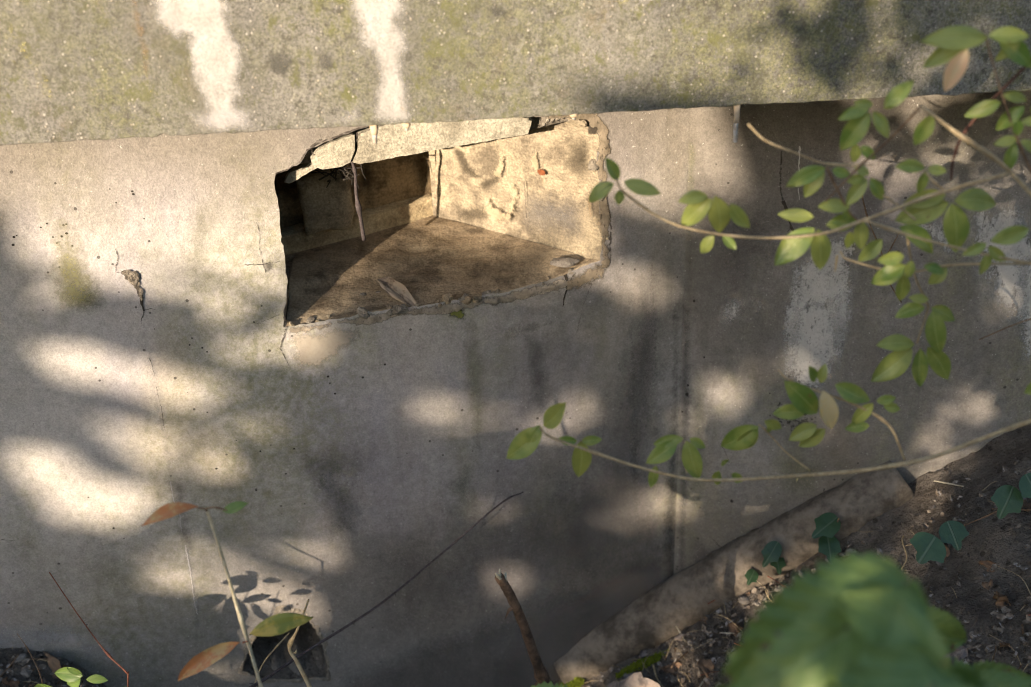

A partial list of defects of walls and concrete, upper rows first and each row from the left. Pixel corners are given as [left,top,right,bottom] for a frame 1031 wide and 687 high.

leakage [158,0,242,129]
leakage [352,0,410,121]
flaking render [284,117,533,184]
flaking render [485,185,517,222]
spalling [546,114,611,291]
spalling [237,605,331,683]